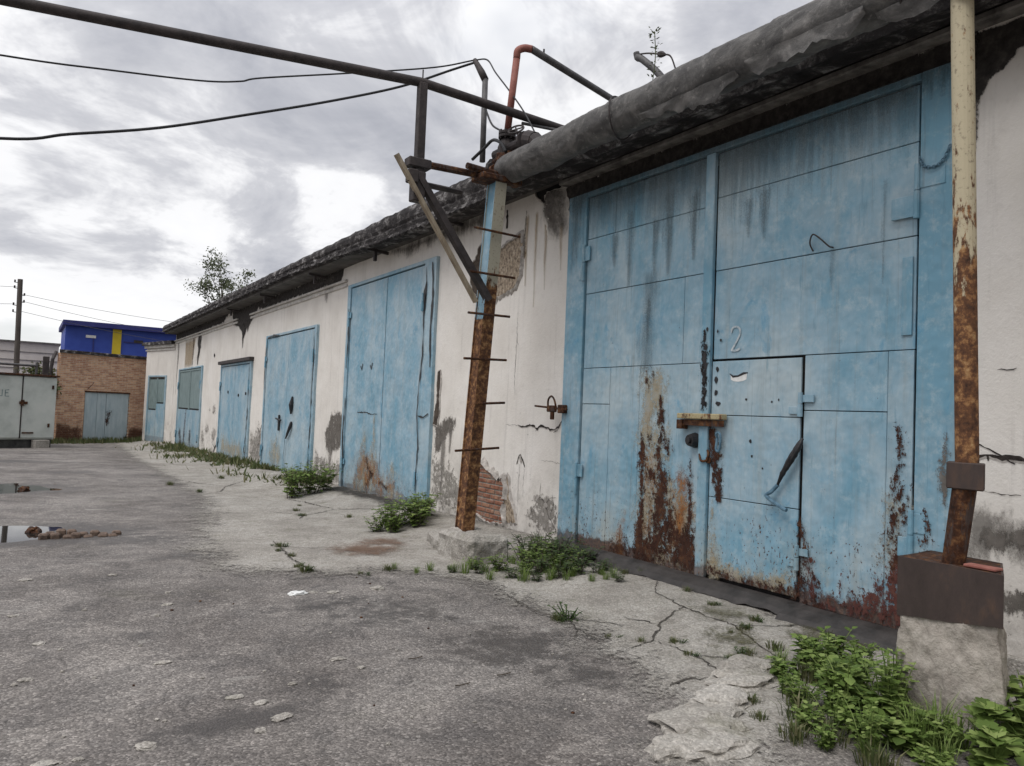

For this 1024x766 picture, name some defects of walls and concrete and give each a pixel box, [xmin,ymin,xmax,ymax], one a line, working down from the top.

damp [526,41,951,258]
spalling [496,229,525,304]
damp [324,412,342,468]
corrosion [353,419,402,498]
damp [434,416,456,488]
spalling [475,454,558,537]
crack [518,421,562,433]
corrosion [608,367,935,628]
corrosion [937,433,950,506]
crack [979,444,1024,465]
crack [503,581,798,686]